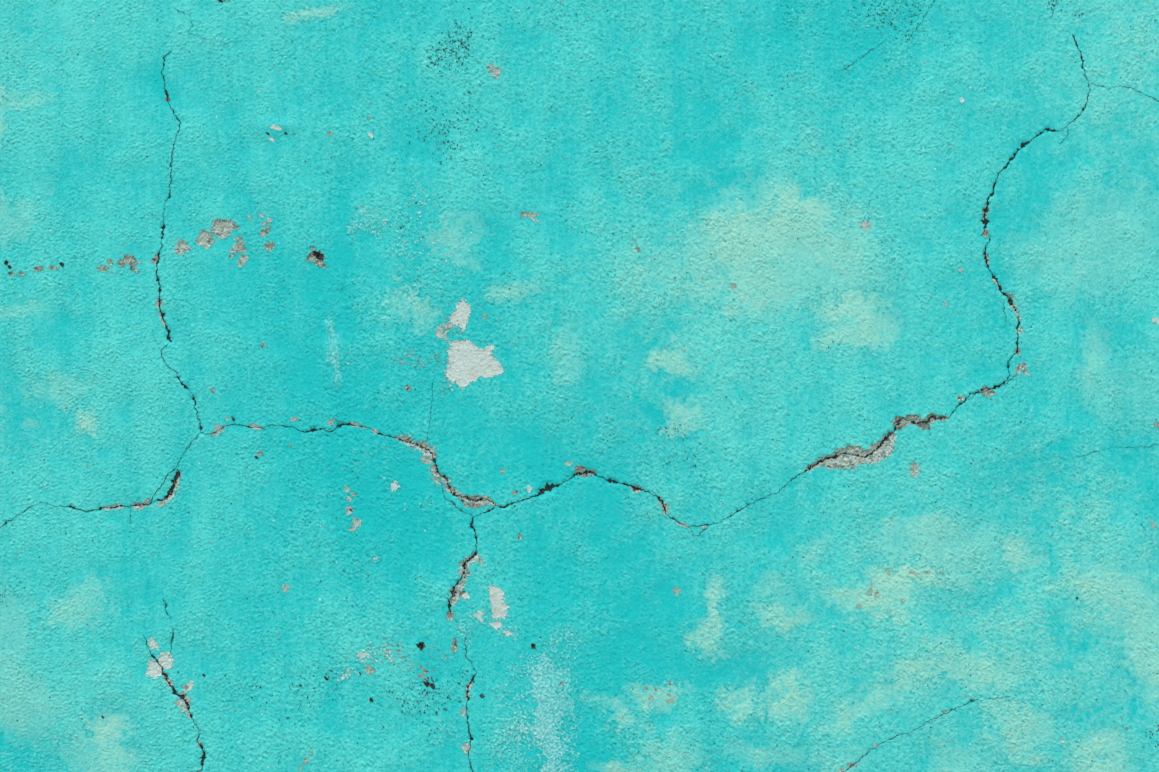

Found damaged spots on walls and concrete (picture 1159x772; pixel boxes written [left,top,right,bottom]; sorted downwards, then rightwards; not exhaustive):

flaking render [172,213,275,267]
peeling [434,298,503,391]
crack [3,34,1159,625]
peeling [909,461,920,479]
crack [143,598,207,772]
crack [460,639,486,772]
crack [838,696,1008,772]